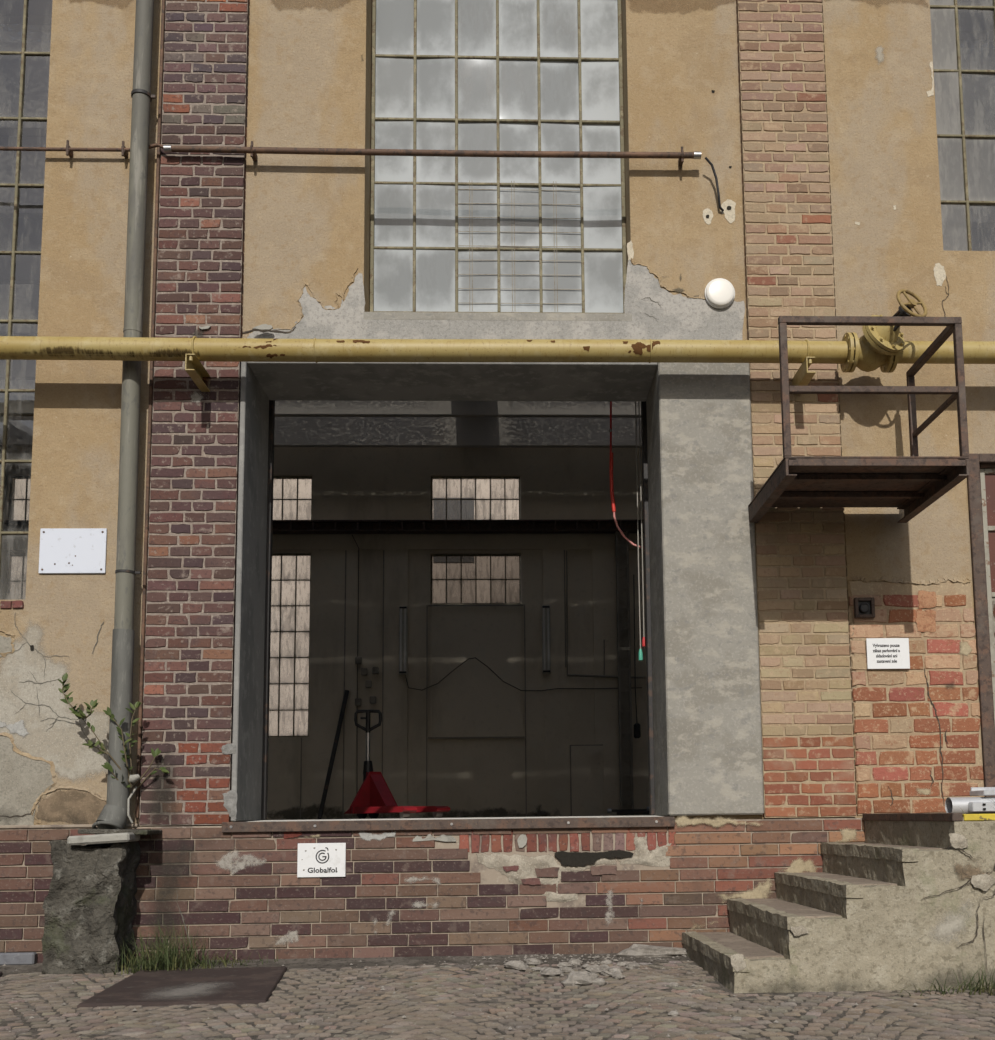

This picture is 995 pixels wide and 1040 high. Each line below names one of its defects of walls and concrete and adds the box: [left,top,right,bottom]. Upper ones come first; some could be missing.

flaking render [623,241,745,355]
flaking render [0,600,24,609]
flaking render [0,732,57,825]
crack [924,668,948,806]
spalling [413,828,676,902]
crack [921,843,995,969]